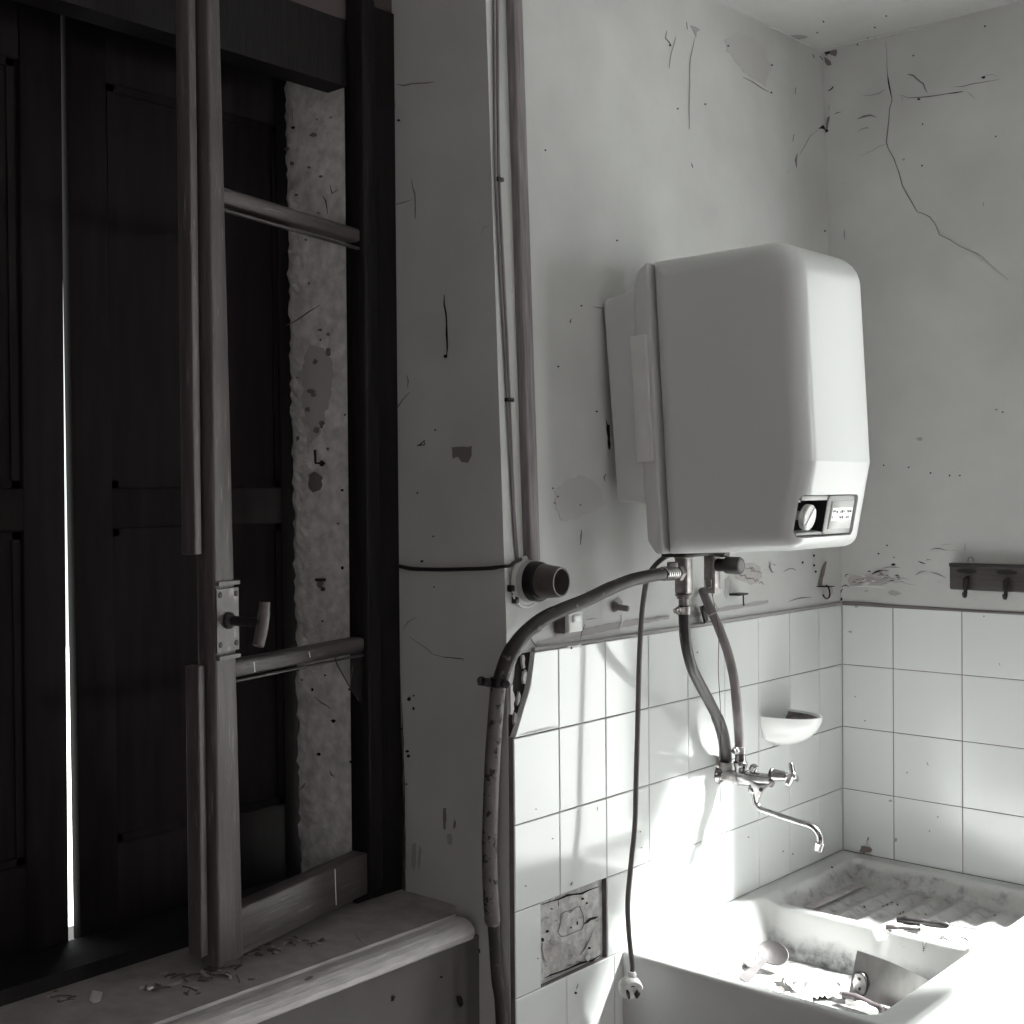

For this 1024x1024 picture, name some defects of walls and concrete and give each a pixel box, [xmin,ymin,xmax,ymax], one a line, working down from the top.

crack [669,37,695,129]
crack [861,48,1008,280]
flaking render [724,563,764,599]
peeling [848,557,900,586]
peeling [540,879,603,982]